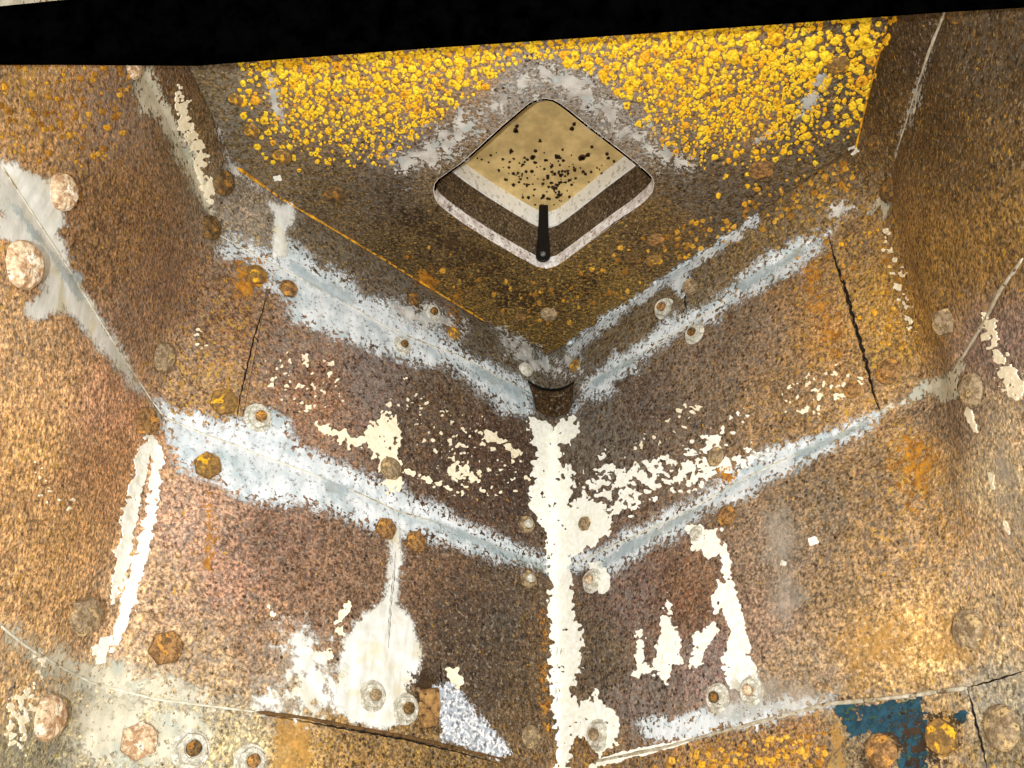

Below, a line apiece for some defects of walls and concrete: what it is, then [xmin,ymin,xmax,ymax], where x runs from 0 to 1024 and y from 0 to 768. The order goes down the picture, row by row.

peeling [175,84,215,205]
corrosion [237,16,897,341]
crack [234,294,268,434]
corrosion [788,217,923,390]
crack [829,238,882,416]
peeling [91,433,166,665]
peeling [265,352,772,768]
crack [259,714,500,764]
peeling [832,696,929,768]
peeling [953,710,969,724]
crack [967,671,1024,768]